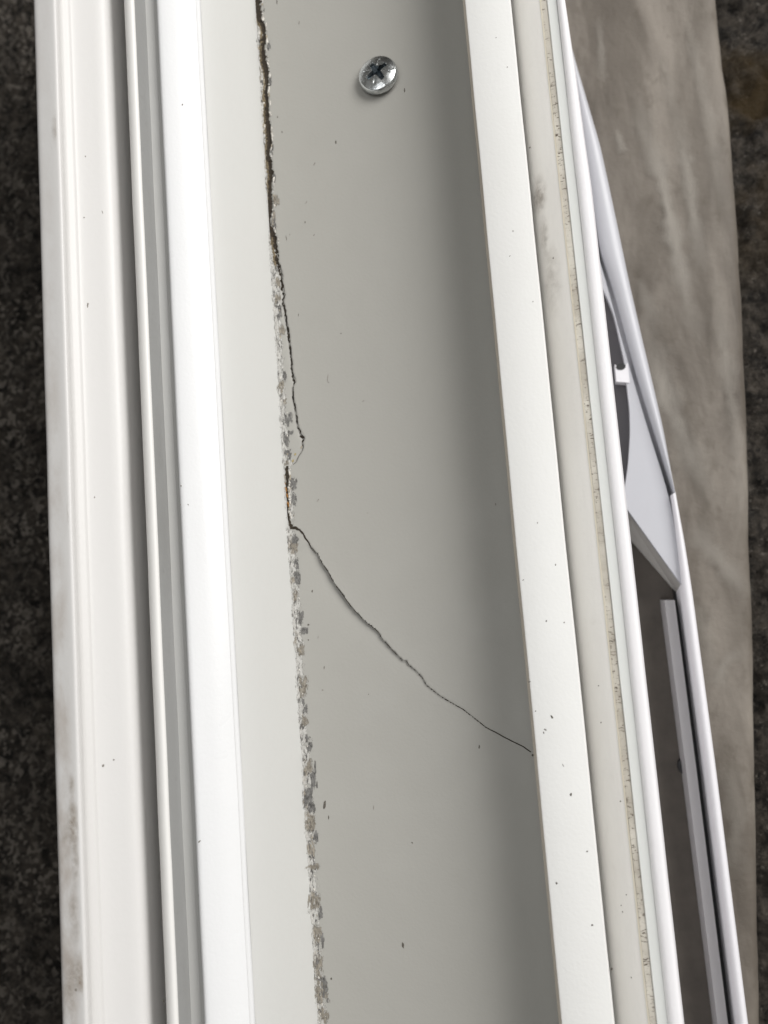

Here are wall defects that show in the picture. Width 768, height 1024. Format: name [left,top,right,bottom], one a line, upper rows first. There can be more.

peeling [254,0,329,1024]
crack [255,0,531,752]